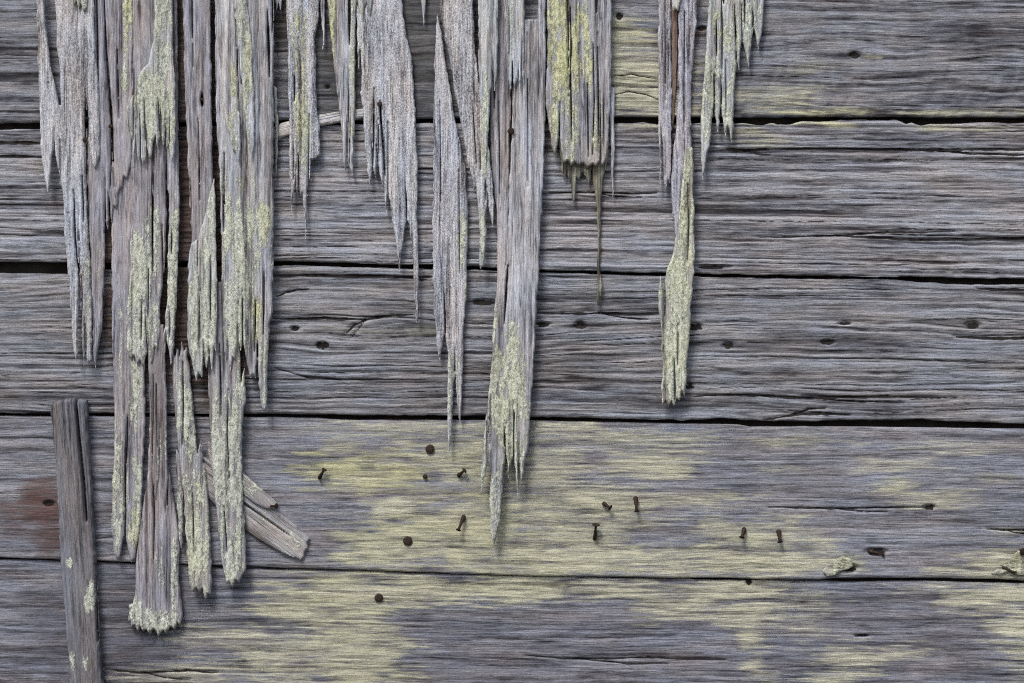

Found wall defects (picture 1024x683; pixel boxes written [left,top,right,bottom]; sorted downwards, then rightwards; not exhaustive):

crack [768,505,921,513]